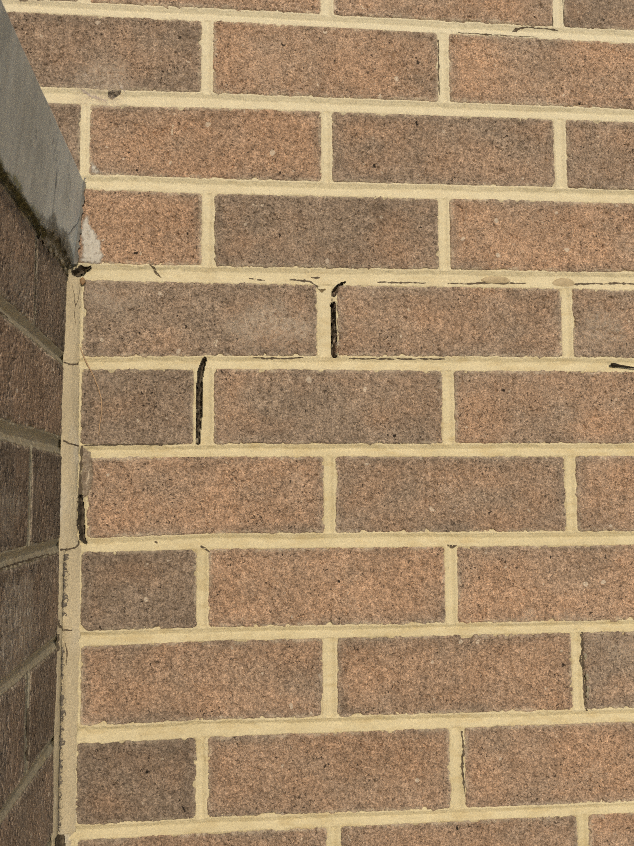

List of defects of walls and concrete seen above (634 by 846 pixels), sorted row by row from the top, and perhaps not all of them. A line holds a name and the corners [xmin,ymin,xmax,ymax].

crack [448,279,526,287]
crack [574,279,634,287]
crack [290,277,445,360]
crack [253,354,303,362]
crack [0,357,207,832]